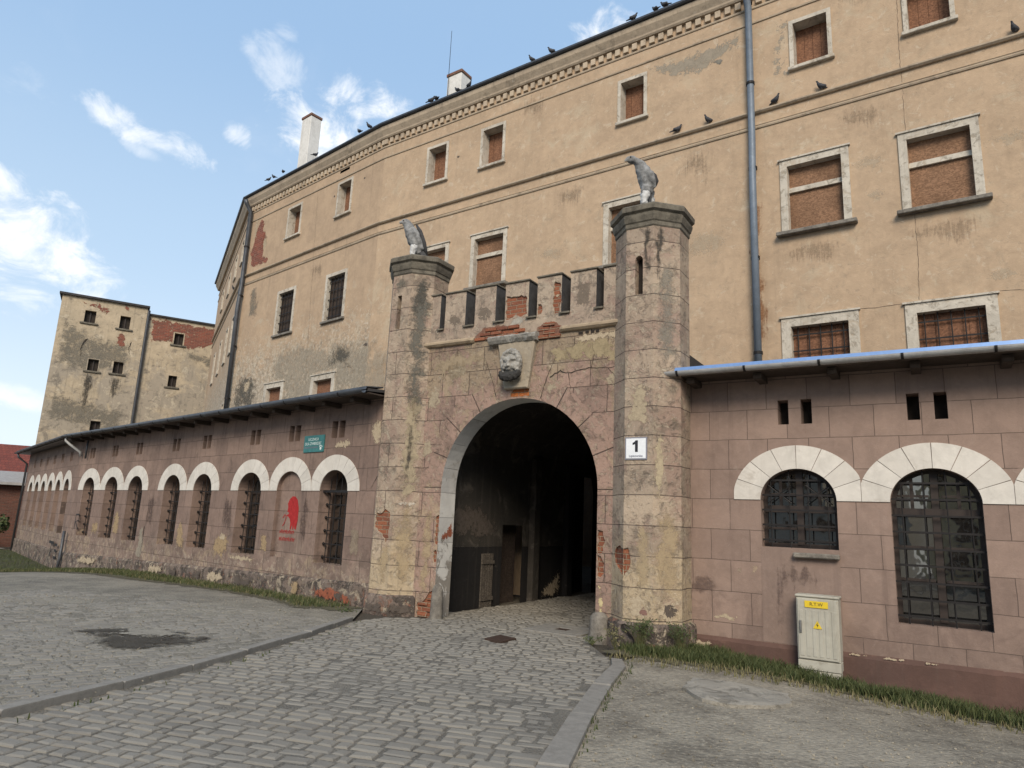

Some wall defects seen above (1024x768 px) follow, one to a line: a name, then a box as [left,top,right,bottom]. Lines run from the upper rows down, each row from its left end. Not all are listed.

flaking render [250,220,268,267]
water stain [49,323,127,428]
flaking render [149,318,215,349]
water stain [234,377,256,406]
water stain [406,282,431,405]
peeling [400,281,615,497]
crack [540,343,615,398]
flaking render [375,510,390,542]
peeling [417,511,453,618]
flaking render [597,530,605,612]
flaking render [616,546,631,573]